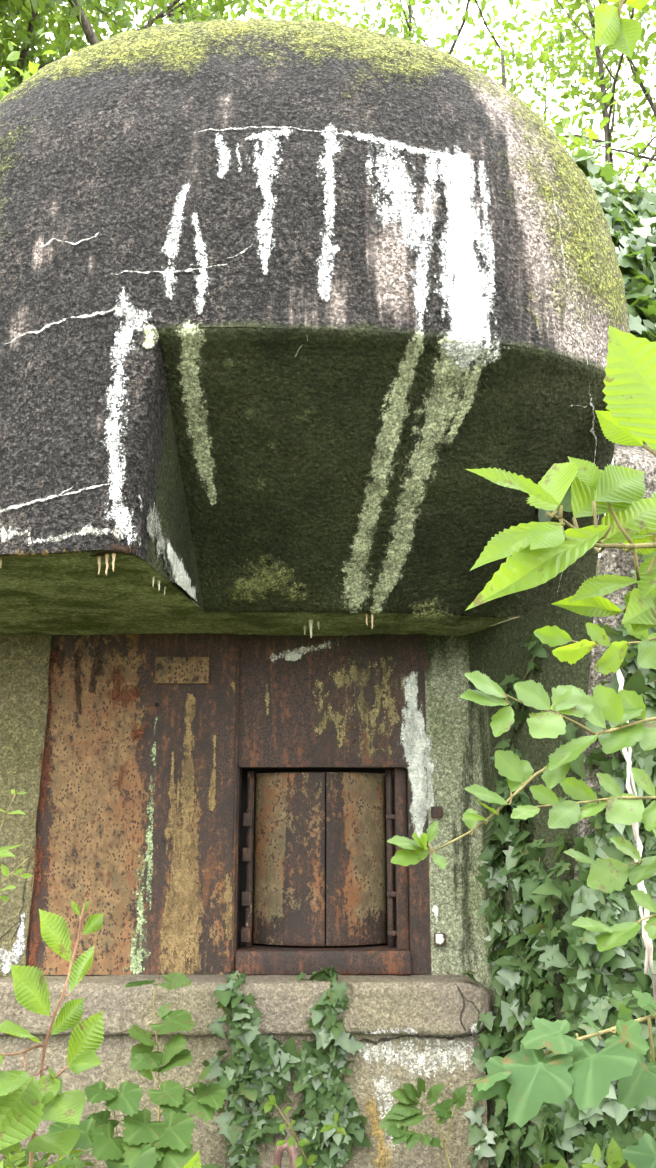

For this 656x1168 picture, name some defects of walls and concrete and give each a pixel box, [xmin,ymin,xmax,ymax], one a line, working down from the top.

crack [41,231,100,247]
crack [6,307,154,344]
efflorescence [76,287,159,545]
crack [111,246,251,275]
efflorescence [162,183,217,505]
efflorescence [215,128,293,274]
efflorescence [270,124,499,661]
rust [35,647,140,816]
peeling [312,656,406,758]
efflorescence [400,672,434,838]
water stain [0,914,25,974]
rust [26,831,50,968]